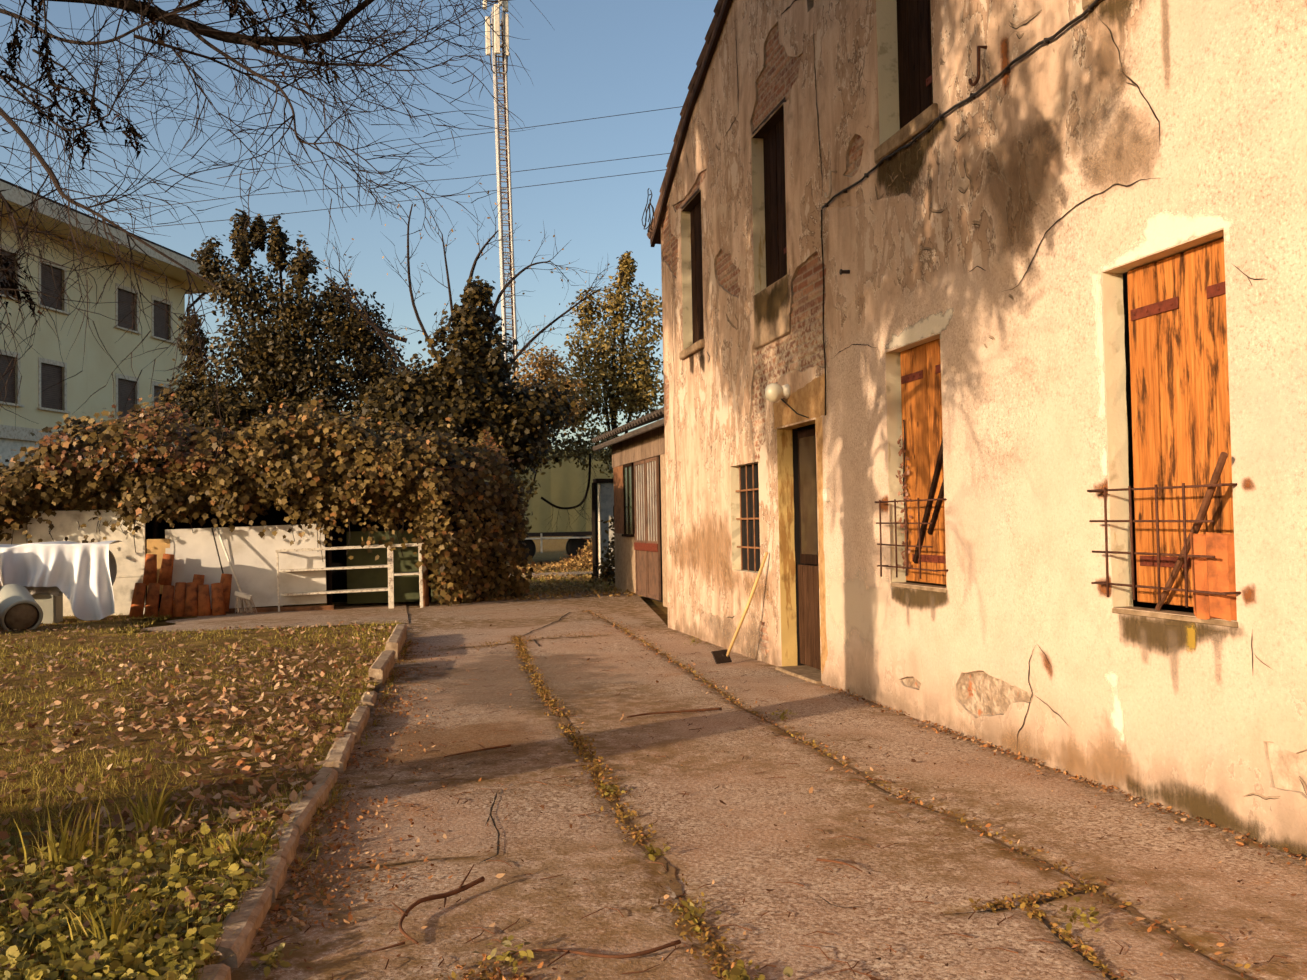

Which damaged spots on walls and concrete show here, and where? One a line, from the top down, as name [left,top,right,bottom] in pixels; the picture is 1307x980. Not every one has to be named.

spalling [750,21,803,135]
damp [988,126,1048,246]
crack [1002,12,1160,292]
damp [1087,113,1151,181]
spalling [714,249,740,329]
peeling [749,148,952,463]
spalling [899,676,922,690]
spalling [955,670,1034,718]
spalling [1245,741,1307,800]